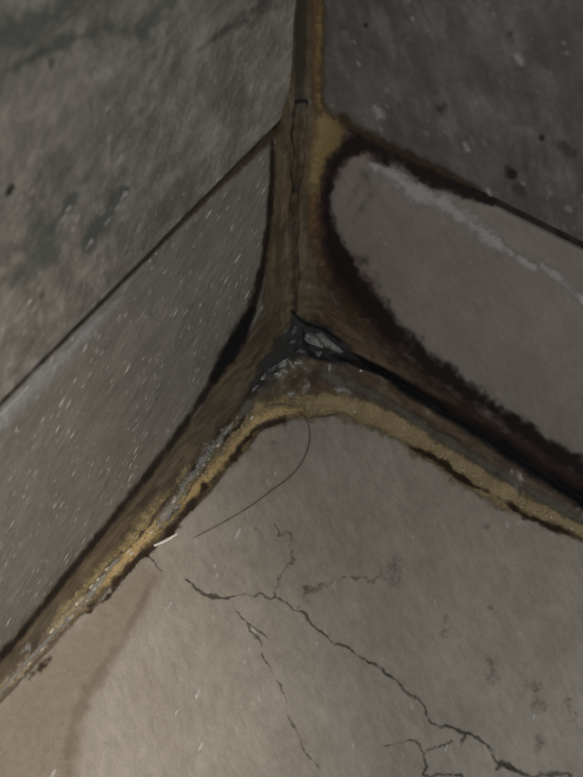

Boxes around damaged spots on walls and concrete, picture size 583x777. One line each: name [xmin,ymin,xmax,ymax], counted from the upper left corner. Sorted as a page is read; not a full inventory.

peeling [252,325,343,393]
leakage [291,311,384,377]
leakage [315,133,583,488]
crack [185,578,572,777]